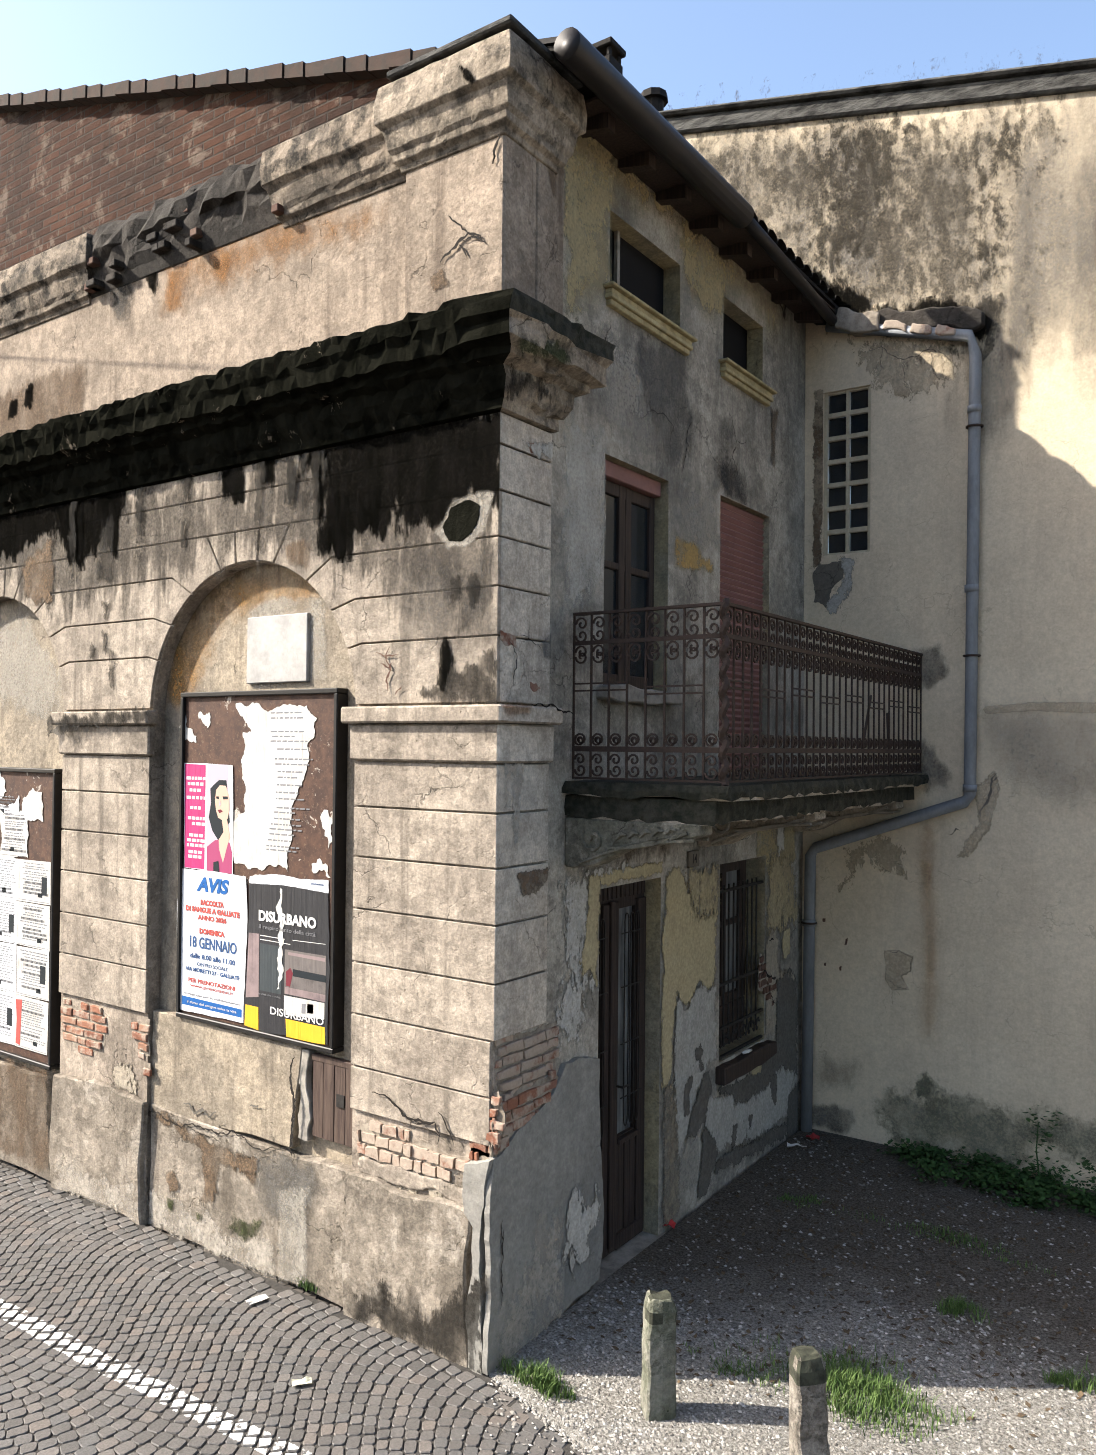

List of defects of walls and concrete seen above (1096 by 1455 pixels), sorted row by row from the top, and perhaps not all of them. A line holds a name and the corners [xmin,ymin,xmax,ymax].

crack [440,216,485,263]
water stain [691,94,1096,360]
water stain [0,365,86,437]
water stain [220,364,551,565]
water stain [0,487,146,581]
water stain [416,637,497,705]
peeling [758,828,799,1037]
flaking render [61,998,108,1056]
flaking render [131,1019,152,1076]
peeling [356,860,850,1227]
peeling [561,1179,601,1280]
water stain [352,1272,487,1375]